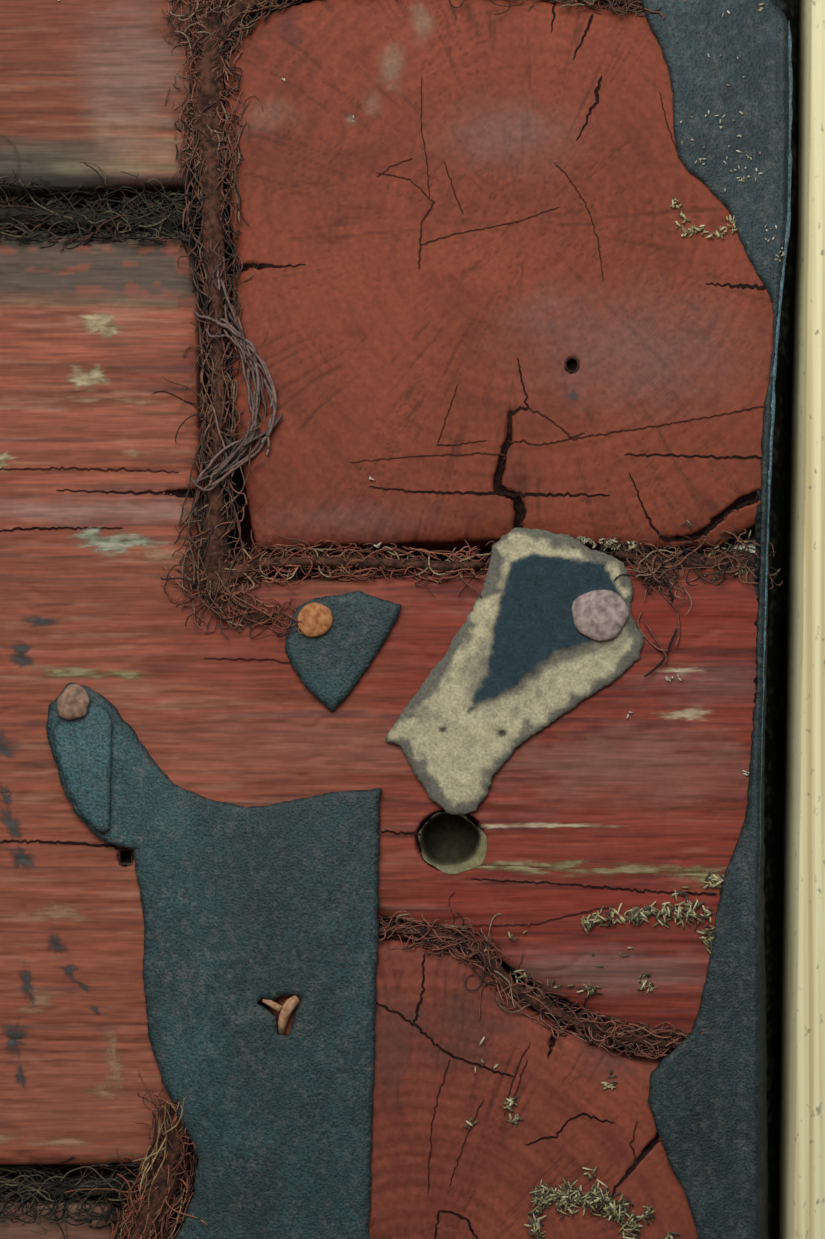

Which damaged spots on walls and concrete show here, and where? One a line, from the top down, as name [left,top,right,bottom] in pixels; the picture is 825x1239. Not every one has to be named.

crack [349,357,764,553]